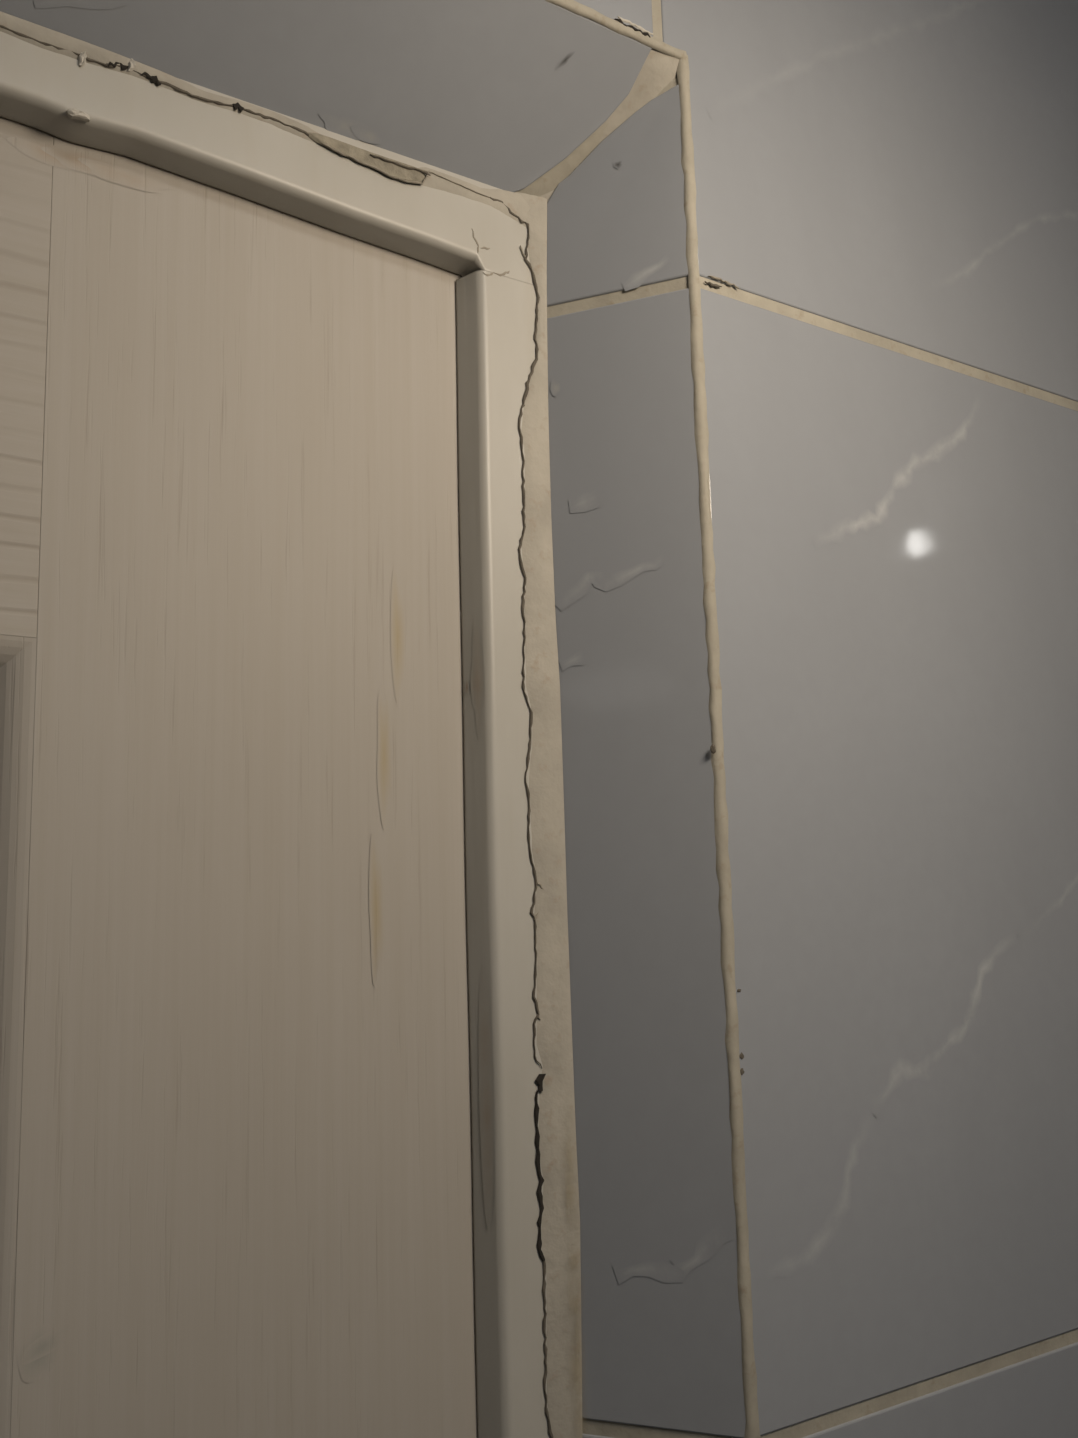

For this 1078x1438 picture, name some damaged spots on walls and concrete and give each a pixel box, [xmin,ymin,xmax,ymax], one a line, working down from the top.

crack [0,25,313,136]
crack [421,169,553,1438]